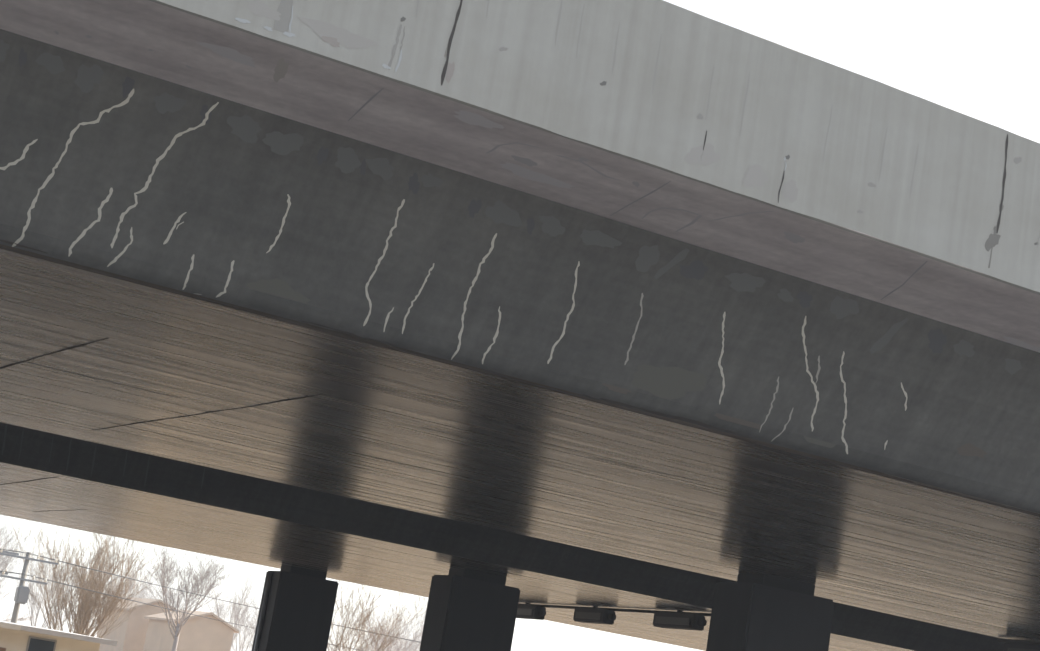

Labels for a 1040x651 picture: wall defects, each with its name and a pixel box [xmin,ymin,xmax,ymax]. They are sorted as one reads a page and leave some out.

crack [441,0,463,85]
crack [0,139,38,170]
crack [12,89,134,247]
crack [68,102,219,267]
crack [182,254,234,297]
crack [266,194,291,253]
crack [363,199,434,334]
crack [451,233,501,364]
crack [547,261,580,364]
crack [718,312,726,405]
crack [759,316,848,454]
crack [988,134,1008,268]